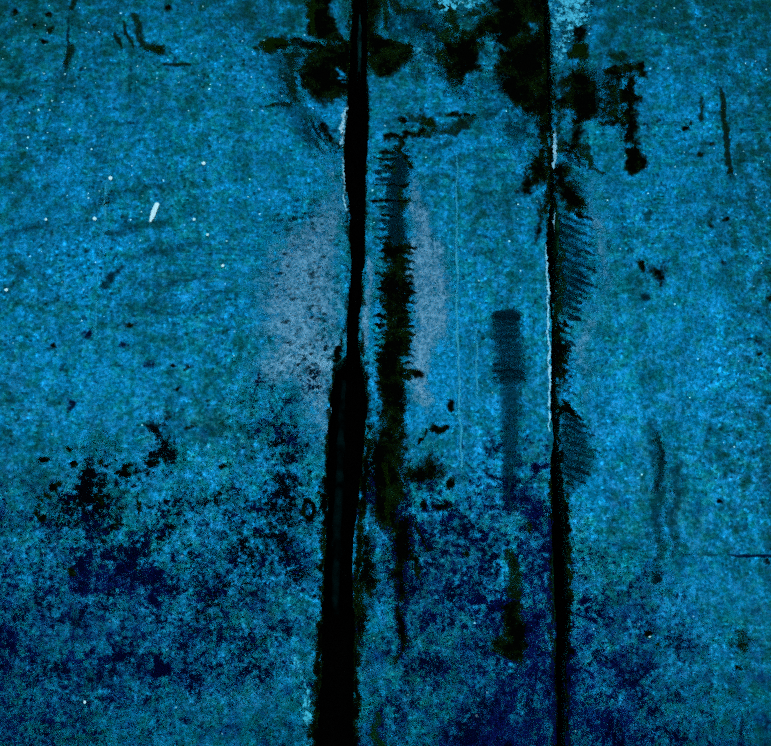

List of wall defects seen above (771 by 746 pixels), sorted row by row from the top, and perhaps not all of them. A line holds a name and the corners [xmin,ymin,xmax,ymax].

water stain [260,0,329,107]
water stain [367,0,492,64]
crack [545,178,559,302]
water stain [327,268,350,421]
crack [318,0,368,746]
water stain [352,153,414,746]
water stain [492,309,525,513]
crack [548,327,556,425]
water stain [534,3,605,746]
water stain [307,435,329,746]
crack [550,452,568,746]